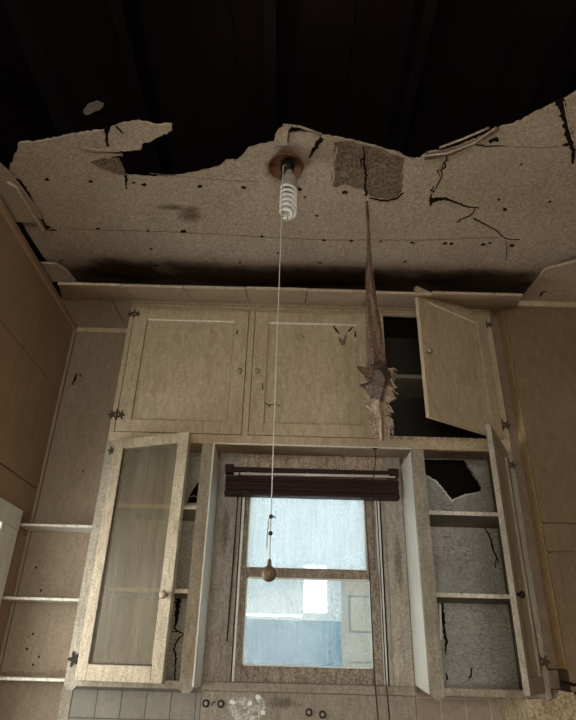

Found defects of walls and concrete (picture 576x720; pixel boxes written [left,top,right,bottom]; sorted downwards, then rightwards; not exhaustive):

crack [309,137,324,158]
crack [360,147,368,196]
peeling [331,141,404,202]
crack [475,98,576,164]
crack [76,229,323,240]
crack [353,156,520,261]
damp [83,259,530,292]
crack [484,528,499,568]
crack [172,598,184,680]
crack [439,603,448,655]